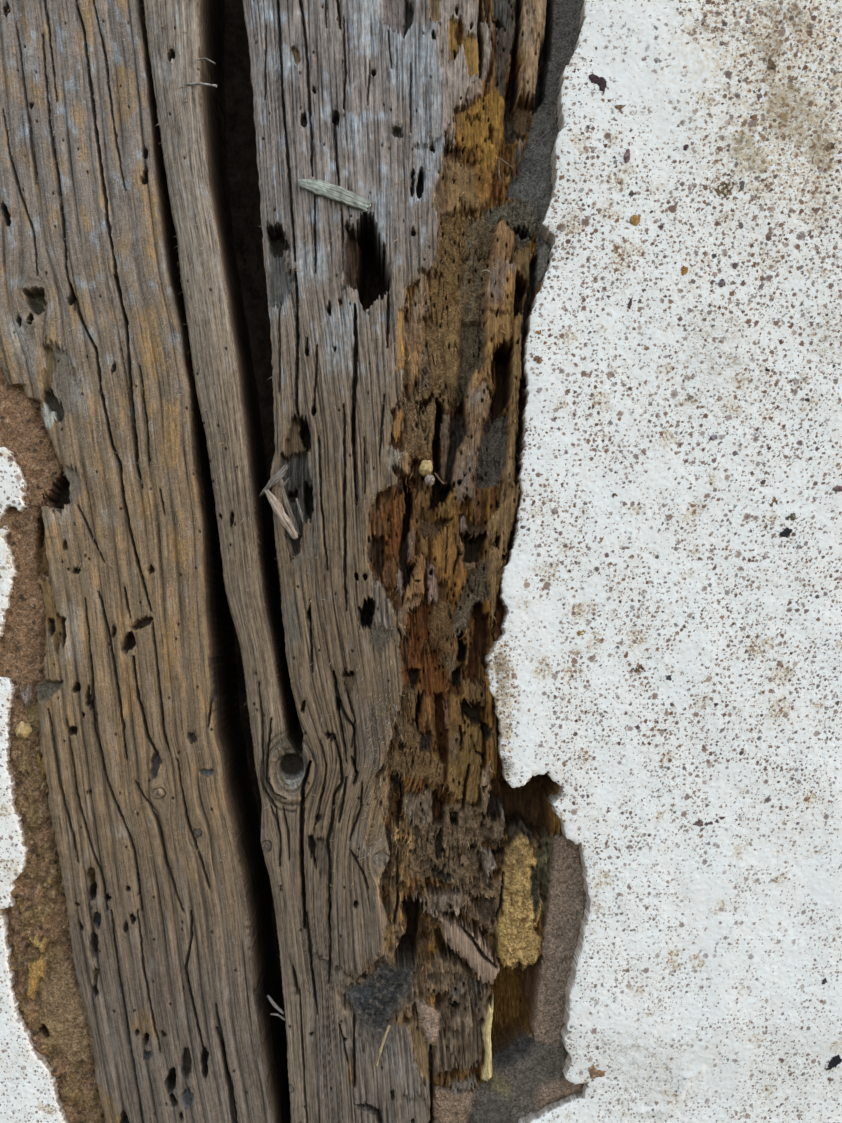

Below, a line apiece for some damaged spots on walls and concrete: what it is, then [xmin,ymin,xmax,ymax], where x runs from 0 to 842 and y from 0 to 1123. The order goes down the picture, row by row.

spalling [505,0,584,292]
spalling [351,212,390,311]
spalling [489,344,515,421]
spalling [430,485,454,511]
spalling [359,597,375,629]
spalling [451,631,482,729]
spalling [0,368,105,1123]
spalling [390,771,400,790]
spalling [394,893,423,967]
spalling [433,774,606,1123]